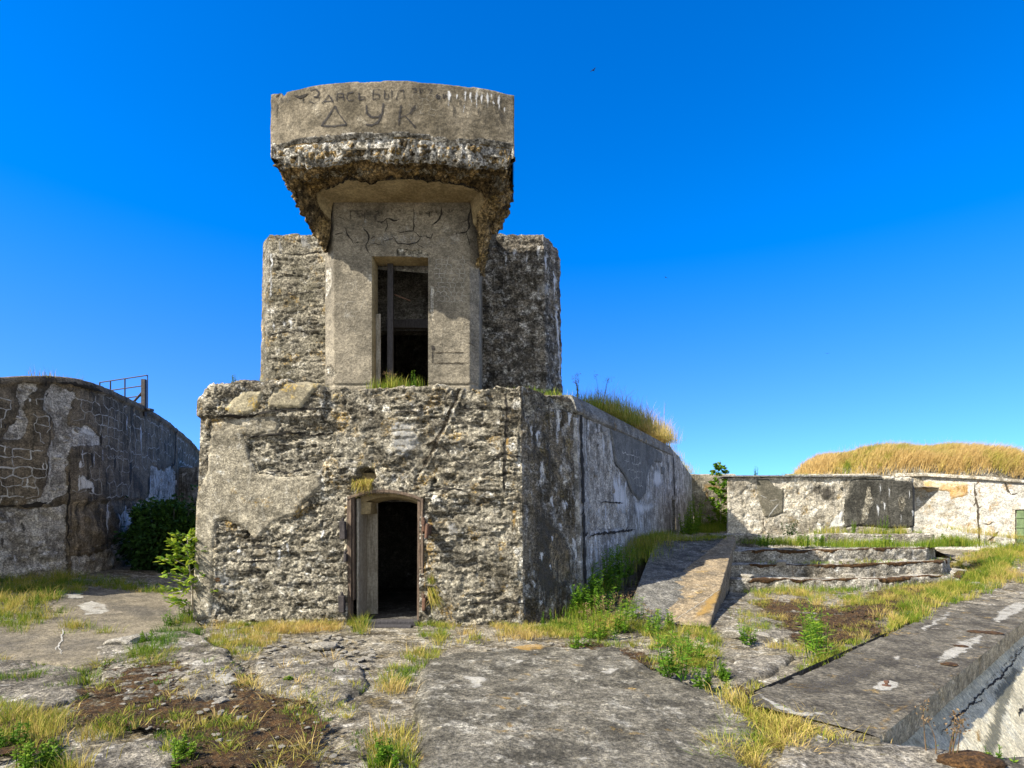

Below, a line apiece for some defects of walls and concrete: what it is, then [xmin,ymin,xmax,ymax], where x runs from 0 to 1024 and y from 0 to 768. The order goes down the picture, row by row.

spalling [271,132,515,192]
crack [271,176,478,302]
crack [269,330,322,359]
spalling [0,383,177,582]
flaking render [193,365,515,623]
crack [942,652,1022,732]